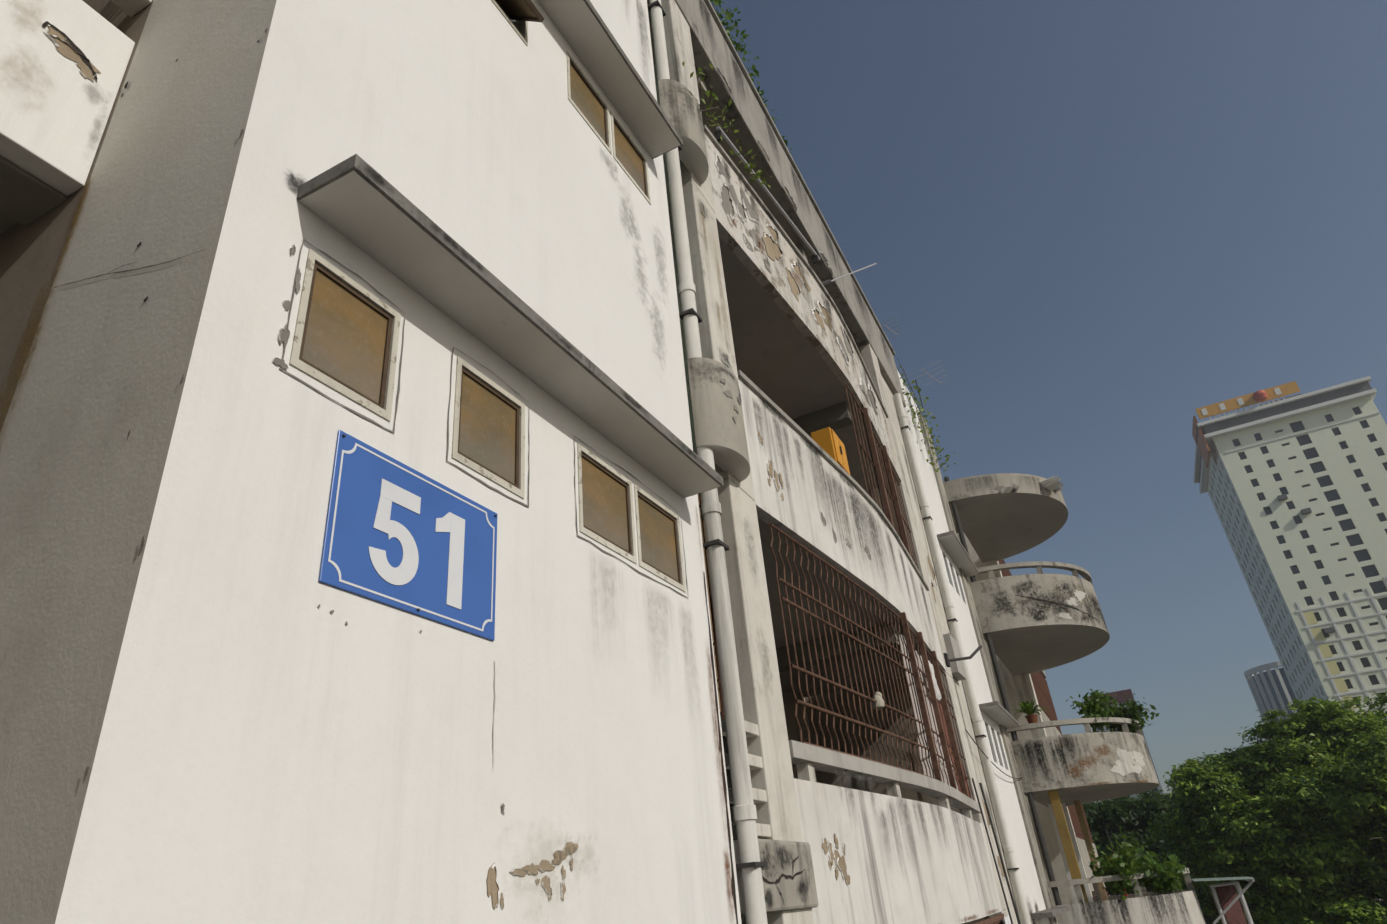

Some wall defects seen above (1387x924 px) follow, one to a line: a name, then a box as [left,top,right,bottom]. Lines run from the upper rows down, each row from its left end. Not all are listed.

spalling [43,24,101,82]
crack [54,249,205,288]
peeling [715,153,878,415]
water stain [797,442,905,573]
mould [994,582,1107,627]
peeling [1110,748,1145,776]
peeling [487,841,579,909]
peeling [822,833,850,886]